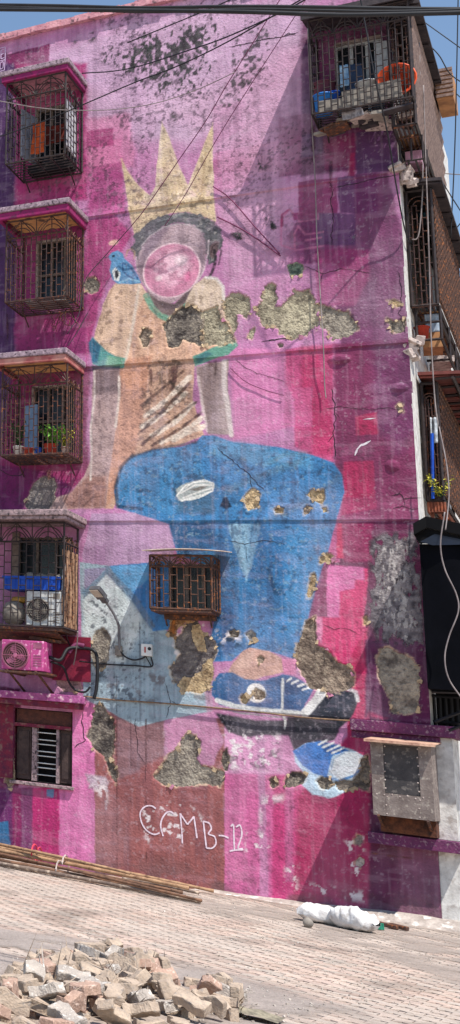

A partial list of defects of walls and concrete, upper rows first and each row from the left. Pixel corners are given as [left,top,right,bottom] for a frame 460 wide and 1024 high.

flaking render [139,262,359,349]
flaking render [385,300,409,334]
crack [327,390,399,456]
flaking render [23,476,57,509]
flaking render [240,489,260,511]
flaking render [303,488,327,515]
flaking render [165,620,218,695]
flaking render [293,617,355,699]
flaking render [377,647,423,714]
flaking render [87,701,118,782]
flaking render [154,730,230,790]
flaking render [270,755,372,793]